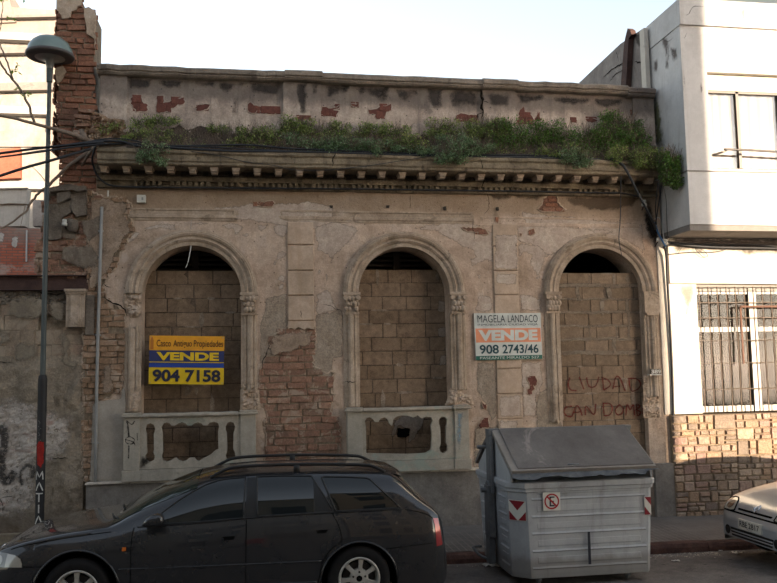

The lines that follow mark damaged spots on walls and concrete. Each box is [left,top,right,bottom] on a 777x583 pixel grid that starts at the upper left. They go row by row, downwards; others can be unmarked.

spalling [130,94,211,114]
spalling [247,102,282,116]
leakage [297,85,317,112]
spalling [350,102,392,120]
leakage [429,89,442,106]
leakage [452,90,478,105]
crack [477,90,488,118]
leakage [489,94,508,105]
leakage [556,98,621,107]
peeling [415,224,612,284]
spalling [240,290,343,460]
peeling [445,362,562,467]